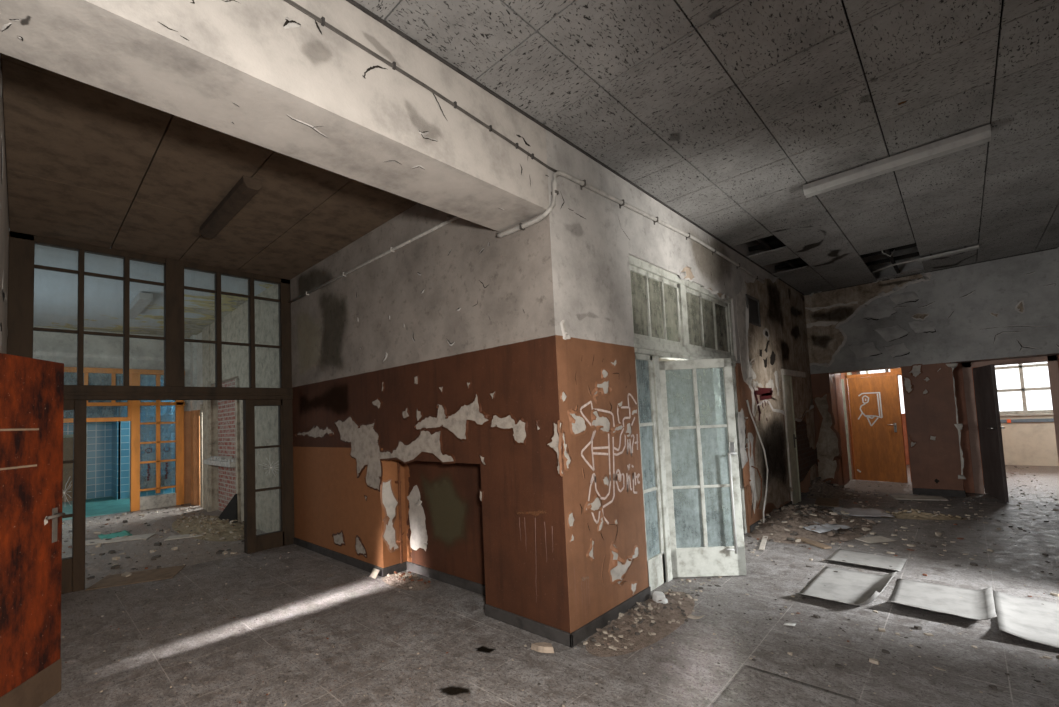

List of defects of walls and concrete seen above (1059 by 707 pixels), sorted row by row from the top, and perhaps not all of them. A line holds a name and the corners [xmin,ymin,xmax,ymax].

leakage [767,285,852,361]
flaking render [679,265,932,514]
peeling [294,358,637,562]
leakage [762,420,787,484]
peeling [332,530,380,579]
peeling [608,542,639,596]